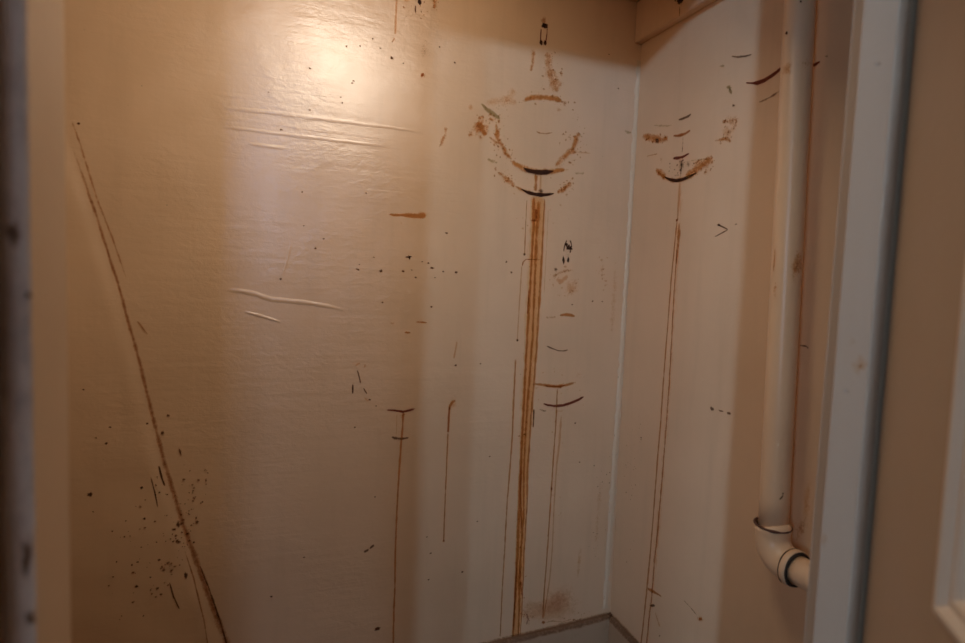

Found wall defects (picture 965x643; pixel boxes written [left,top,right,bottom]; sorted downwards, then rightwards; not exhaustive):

rust [533,397,583,425]